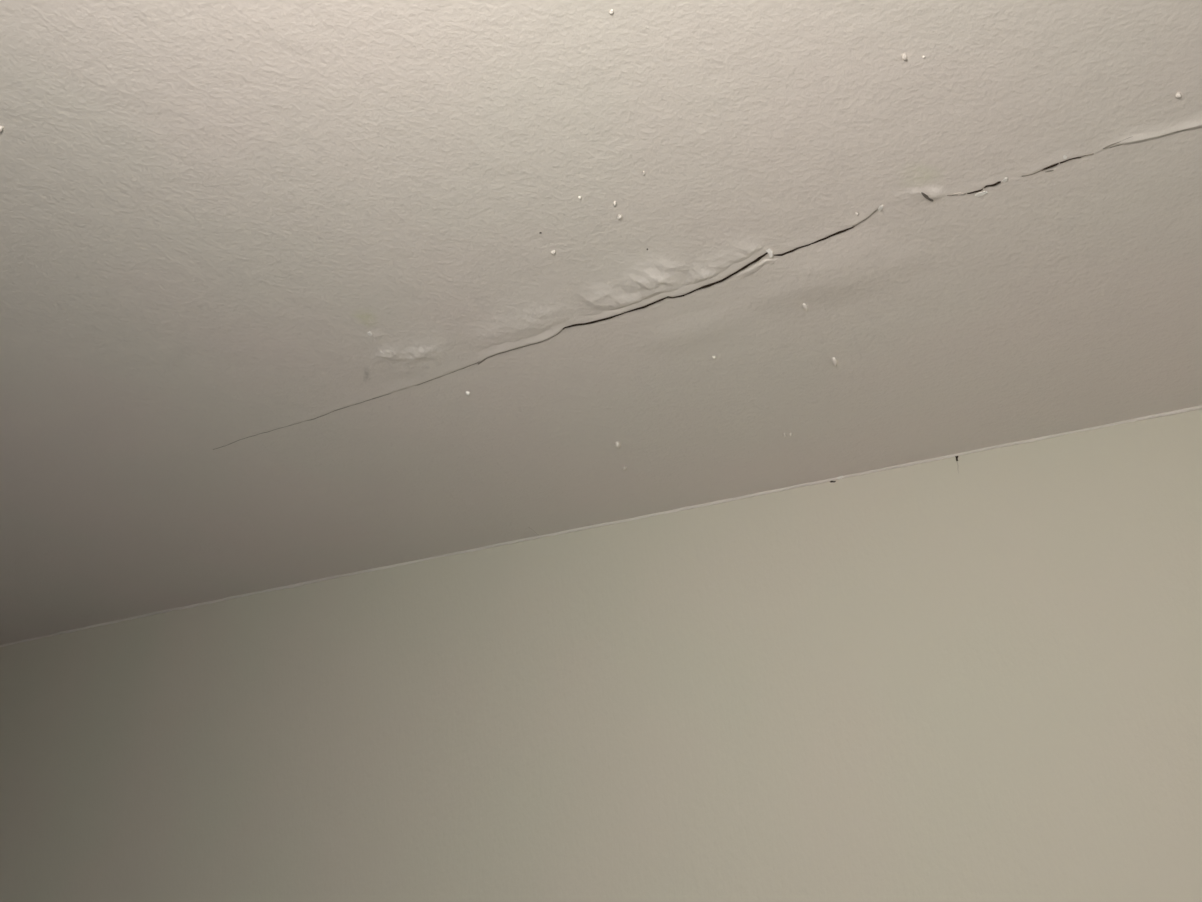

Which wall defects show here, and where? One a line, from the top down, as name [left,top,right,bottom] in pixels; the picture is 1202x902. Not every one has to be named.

crack [213,201,883,450]